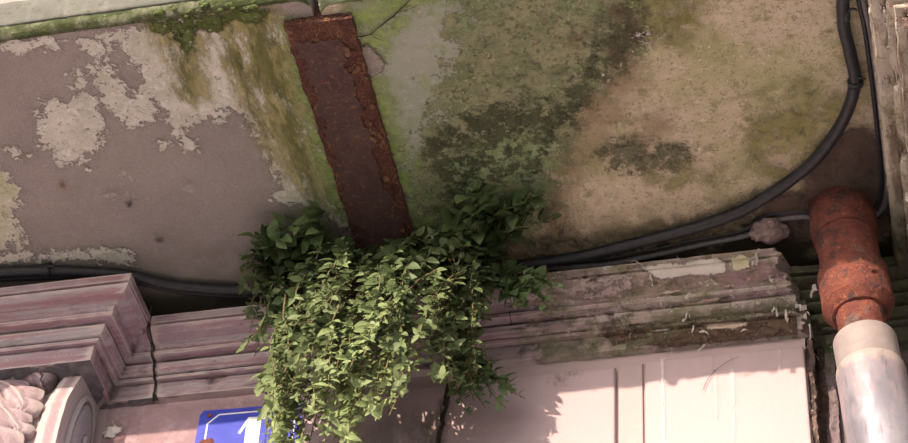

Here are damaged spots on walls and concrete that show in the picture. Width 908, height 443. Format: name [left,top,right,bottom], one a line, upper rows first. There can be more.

damp [345,0,436,57]
peeling [0,9,351,236]
damp [232,50,255,118]
damp [252,8,347,222]
damp [370,0,903,264]
peeling [0,164,145,270]
crack [147,298,158,402]
spalling [541,249,838,443]
crack [435,381,450,443]